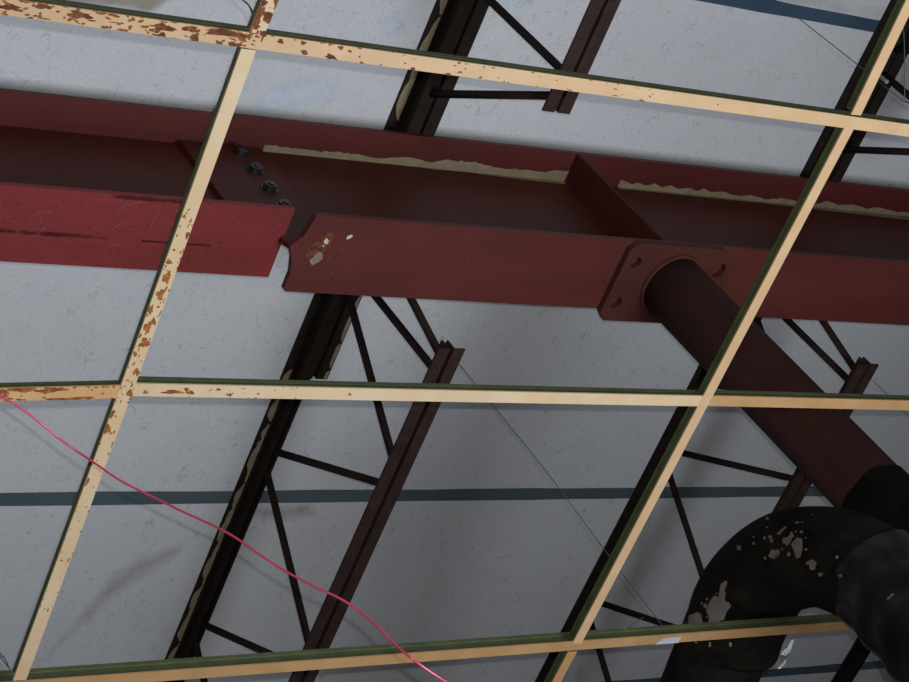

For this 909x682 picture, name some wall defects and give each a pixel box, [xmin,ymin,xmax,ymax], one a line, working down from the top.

water stain [68,0,162,10]
corrosion [0,0,284,47]
peeling [263,145,569,184]
peeling [618,180,797,207]
peeling [812,201,909,220]
corrosion [0,209,210,456]
peeling [167,399,279,659]
peeling [752,517,823,577]
peeling [688,581,731,624]